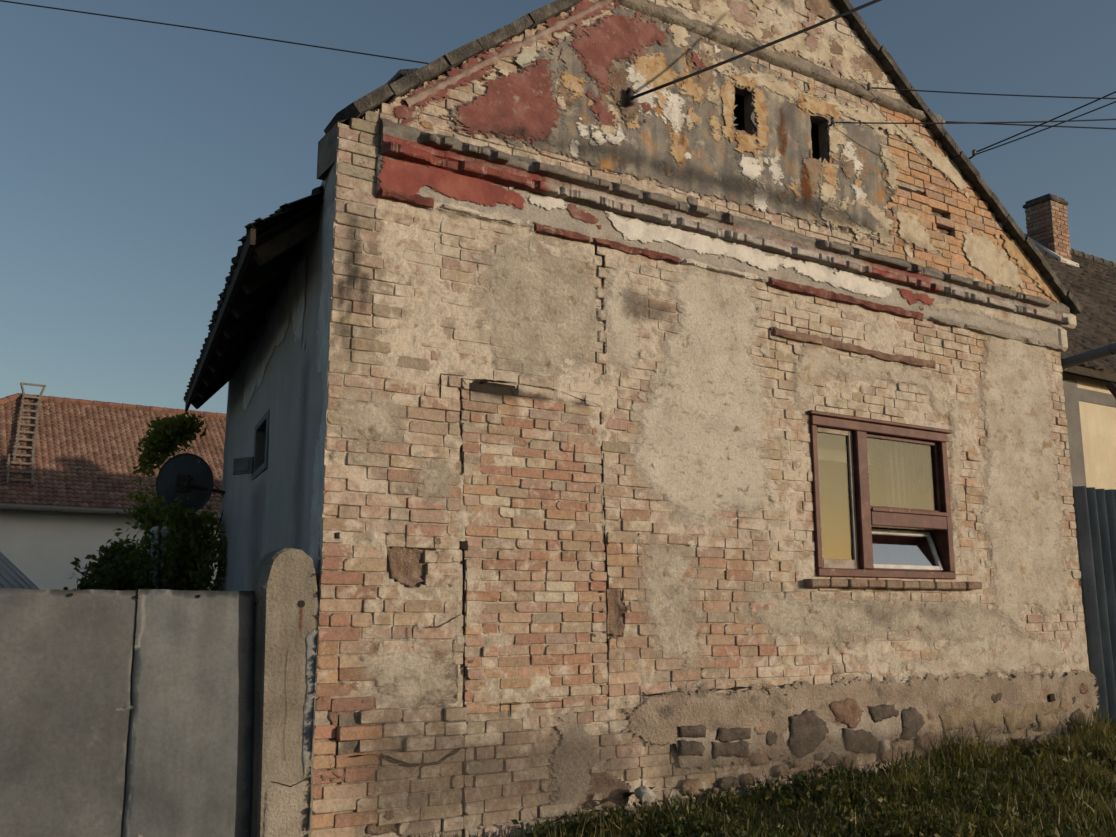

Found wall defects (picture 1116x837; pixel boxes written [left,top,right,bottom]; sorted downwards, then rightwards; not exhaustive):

peeling [395,0,1061,303]
peeling [377,156,1053,334]
hole [469,382,513,396]
peeling [241,179,356,837]
spalling [387,530,441,588]
spalling [593,588,631,639]
spalling [577,772,630,820]